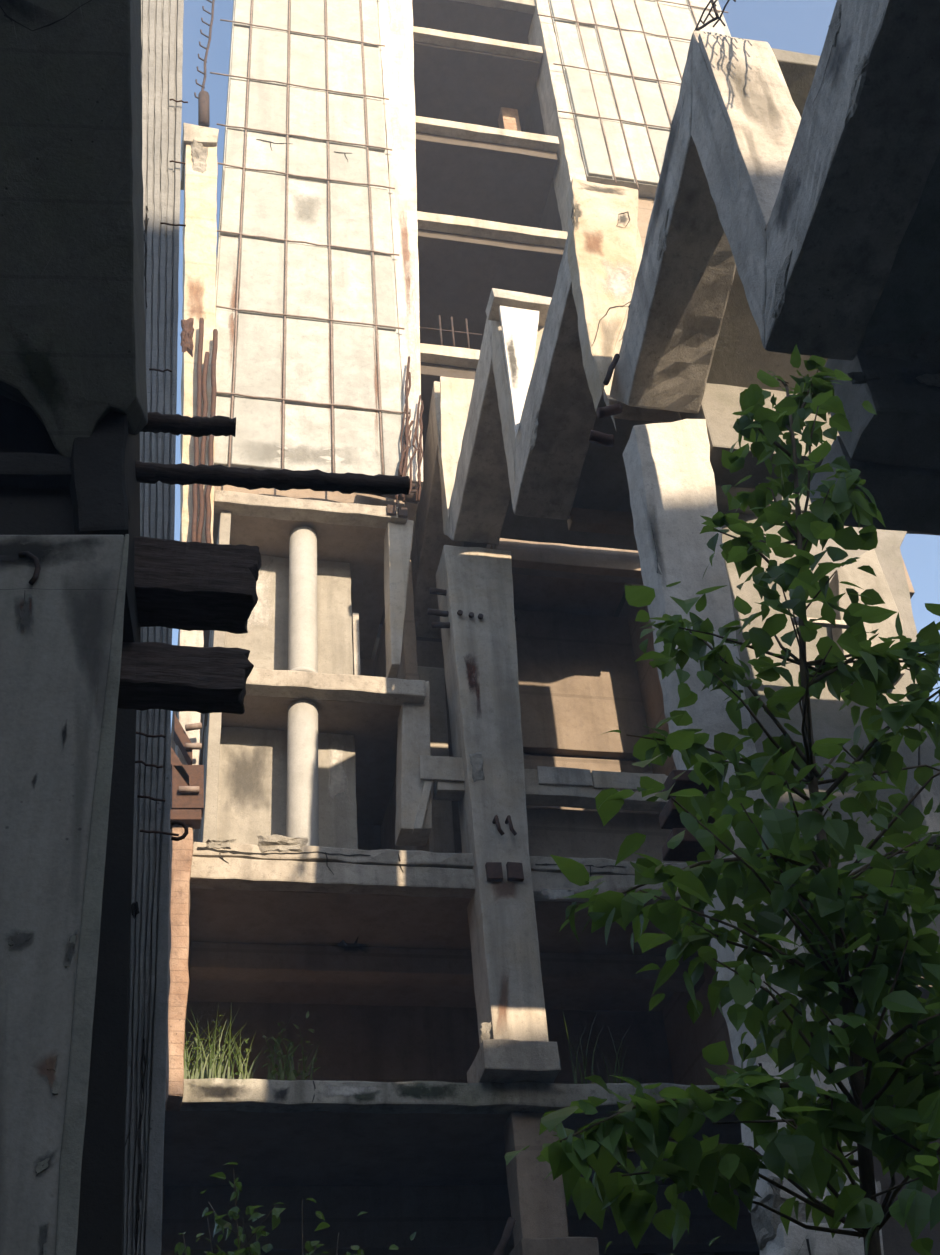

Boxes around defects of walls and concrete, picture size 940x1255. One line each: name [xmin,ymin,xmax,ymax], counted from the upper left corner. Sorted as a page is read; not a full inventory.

rust [587,237,600,250]
rust [190,284,202,314]
crack [592,301,631,345]
rust [466,659,480,711]
damp [199,1085,240,1098]